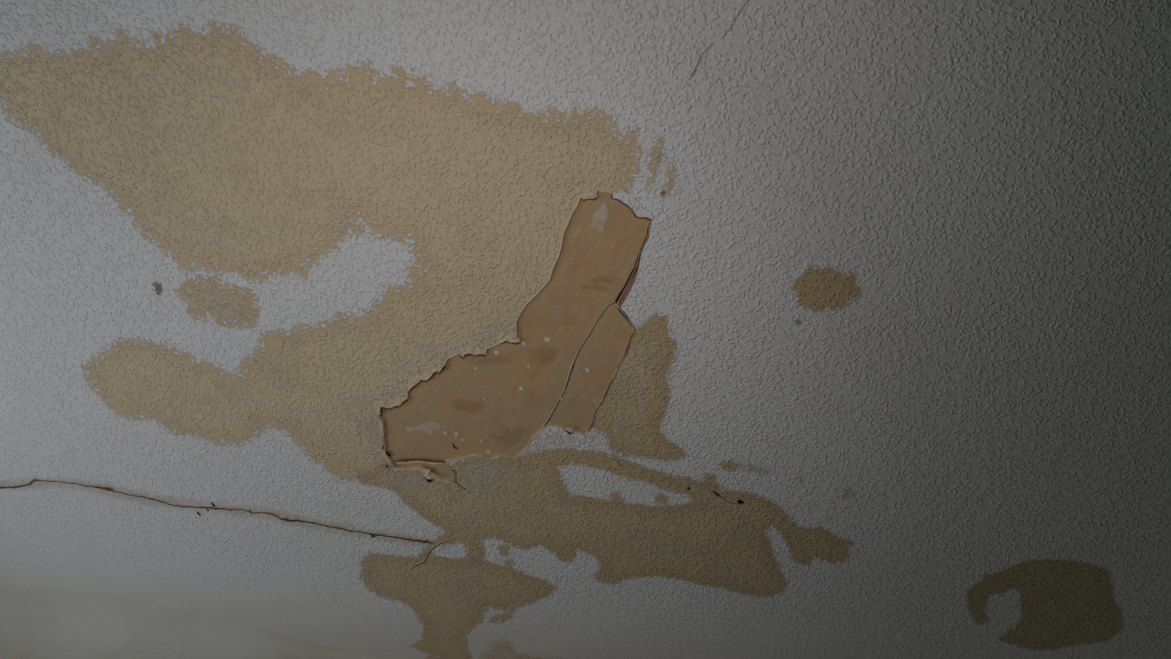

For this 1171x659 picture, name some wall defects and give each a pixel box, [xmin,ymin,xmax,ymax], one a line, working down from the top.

damp [0,19,862,659]
peeling [373,189,653,490]
crack [0,478,458,570]
damp [967,560,1121,650]